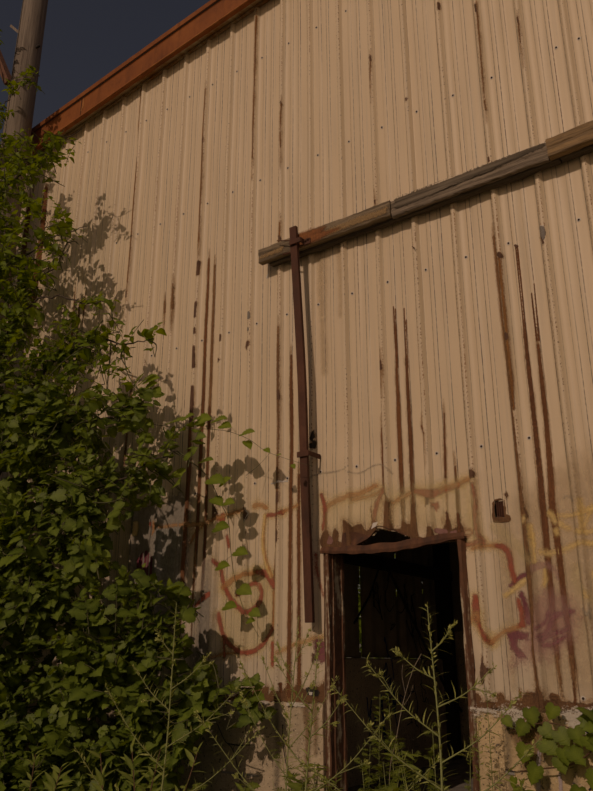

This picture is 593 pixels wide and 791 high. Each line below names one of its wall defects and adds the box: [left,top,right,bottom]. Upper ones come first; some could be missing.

rust [180,88,216,607]
rust [252,327,325,756]
rust [320,306,434,548]
rust [443,411,466,544]
rust [476,236,593,767]